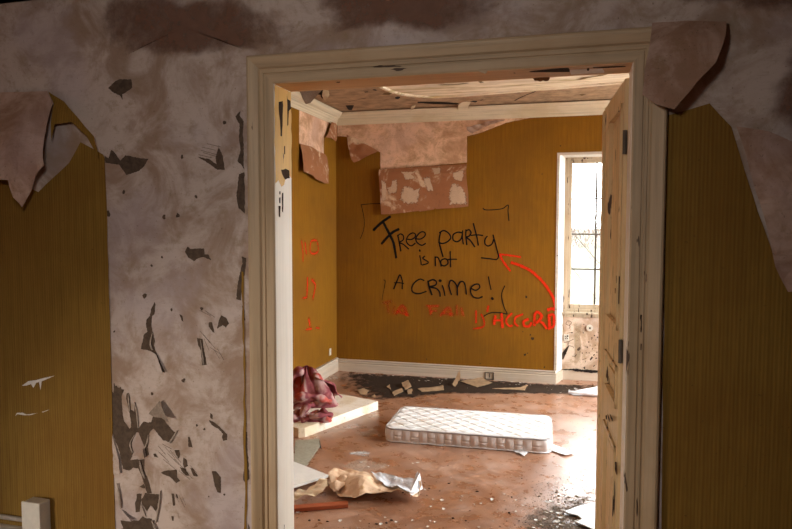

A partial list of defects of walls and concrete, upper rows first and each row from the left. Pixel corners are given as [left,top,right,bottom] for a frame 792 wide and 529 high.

flaking render [279,90,527,169]
spalling [104,150,148,175]
spalling [199,147,225,170]
spalling [185,247,211,261]
spalling [209,315,229,332]
peeling [141,302,165,374]
spalling [197,338,207,365]
peeling [112,383,198,529]
spalling [212,471,221,493]